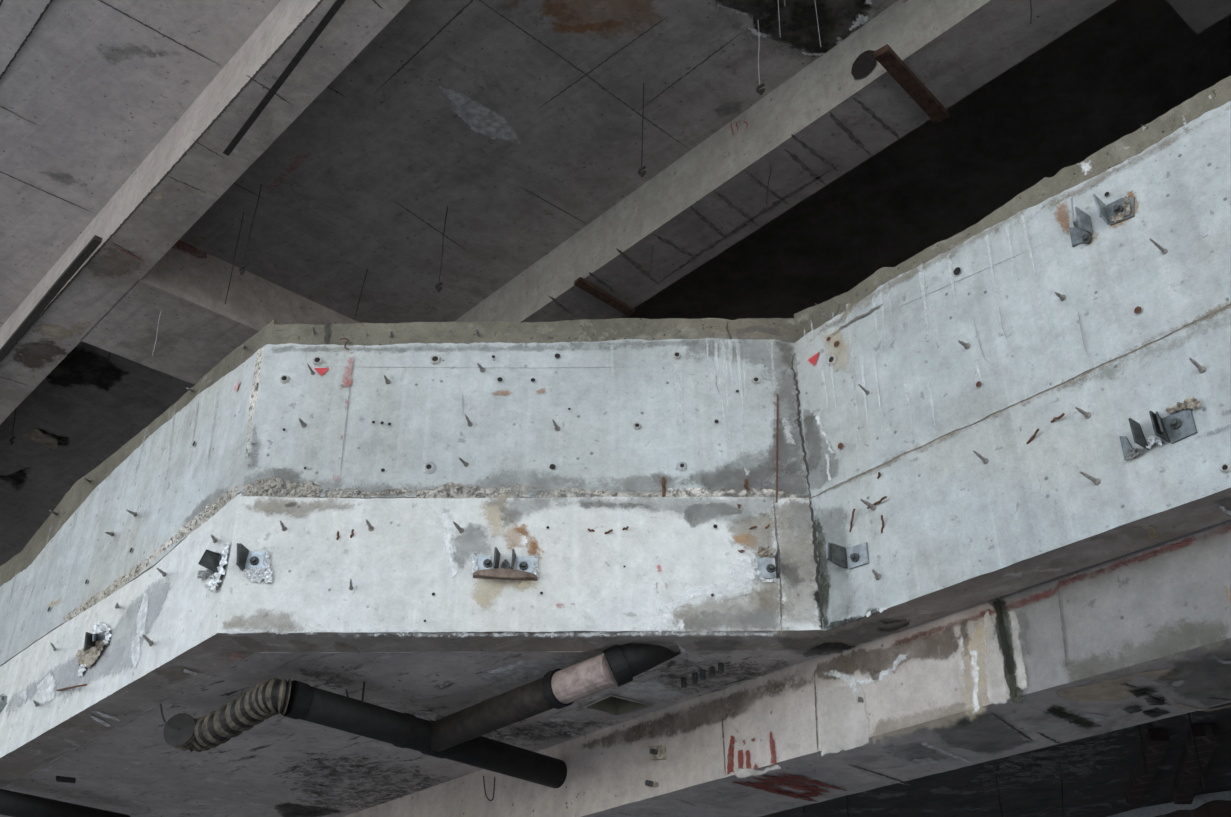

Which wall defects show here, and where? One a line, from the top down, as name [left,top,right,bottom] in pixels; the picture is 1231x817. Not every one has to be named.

corrosion [874,44,949,124]
peeling [827,654,908,703]